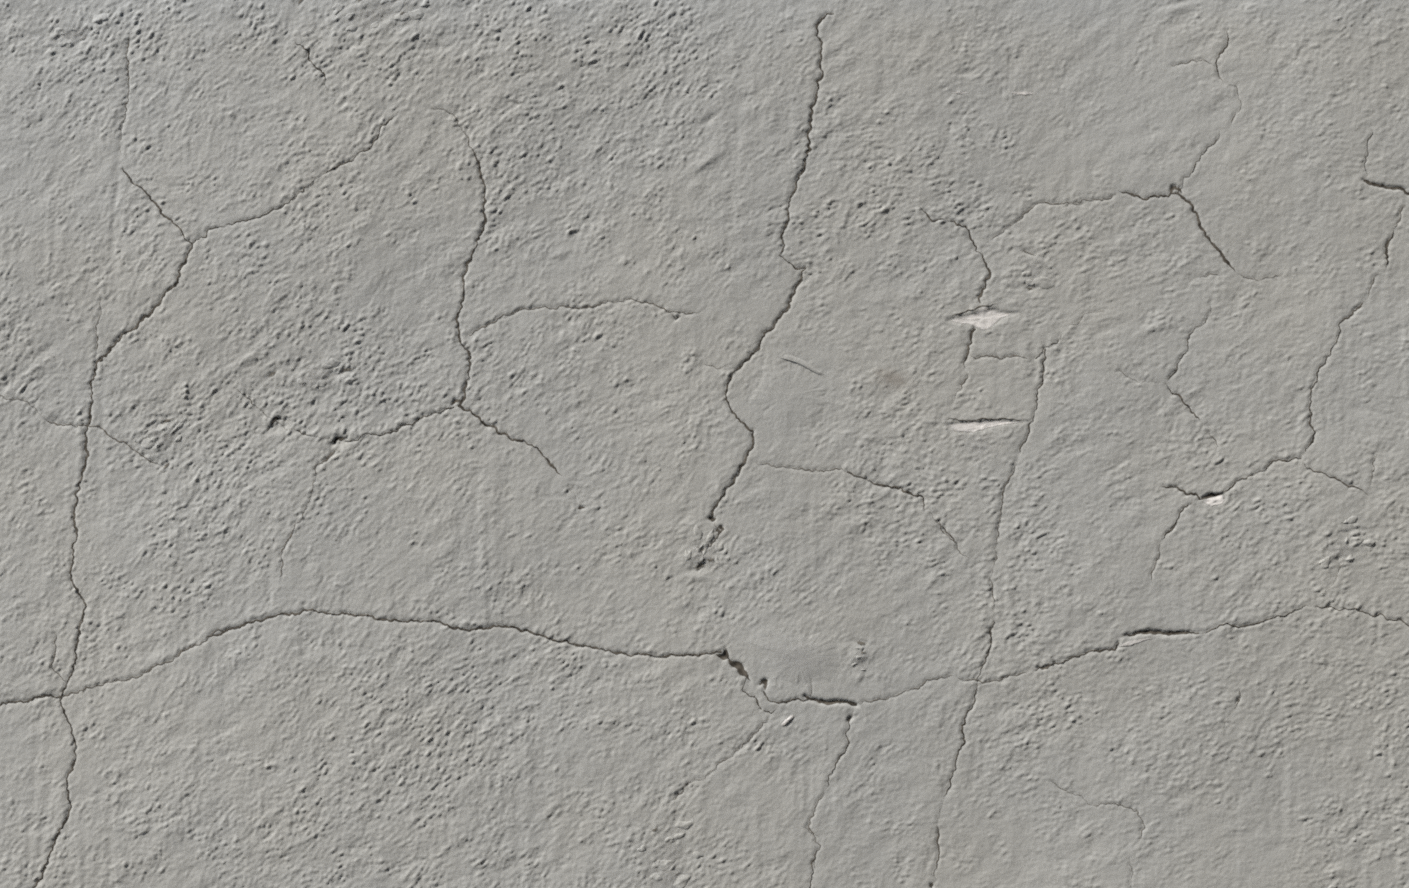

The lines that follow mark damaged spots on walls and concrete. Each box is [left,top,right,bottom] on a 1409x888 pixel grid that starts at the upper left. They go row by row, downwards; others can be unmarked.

crack [119,32,132,151]
crack [295,43,326,87]
crack [920,25,1280,303]
crack [0,108,1026,888]
crack [701,13,968,557]
spalling [952,303,1010,330]
spalling [948,418,1027,432]
crack [954,328,1061,607]
crack [1111,307,1217,445]
crack [1151,132,1409,579]
crack [1036,563,1409,670]
crack [1052,781,1145,887]